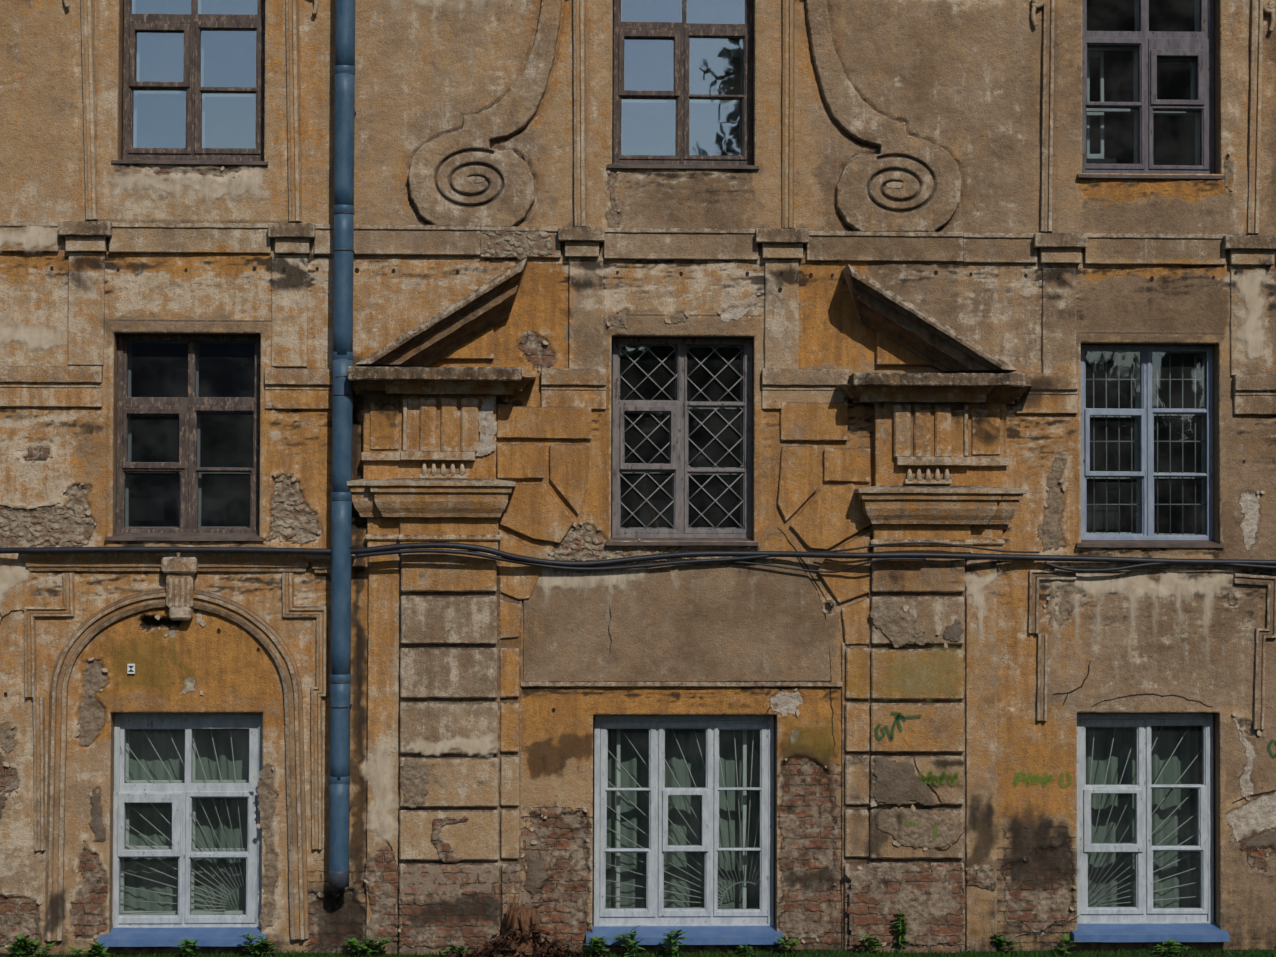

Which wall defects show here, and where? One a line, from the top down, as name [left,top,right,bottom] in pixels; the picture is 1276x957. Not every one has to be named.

flaking render [0,483,96,547]
flaking render [266,473,321,543]
flaking render [870,599,934,648]
flaking render [74,657,108,746]
crack [1053,660,1213,707]
flaking render [0,724,19,792]
leakage [526,733,593,777]
flaking render [771,688,1077,949]
leakage [965,796,998,866]
leakage [1007,814,1074,887]
flaking render [1226,713,1276,871]
flaking render [0,896,42,948]